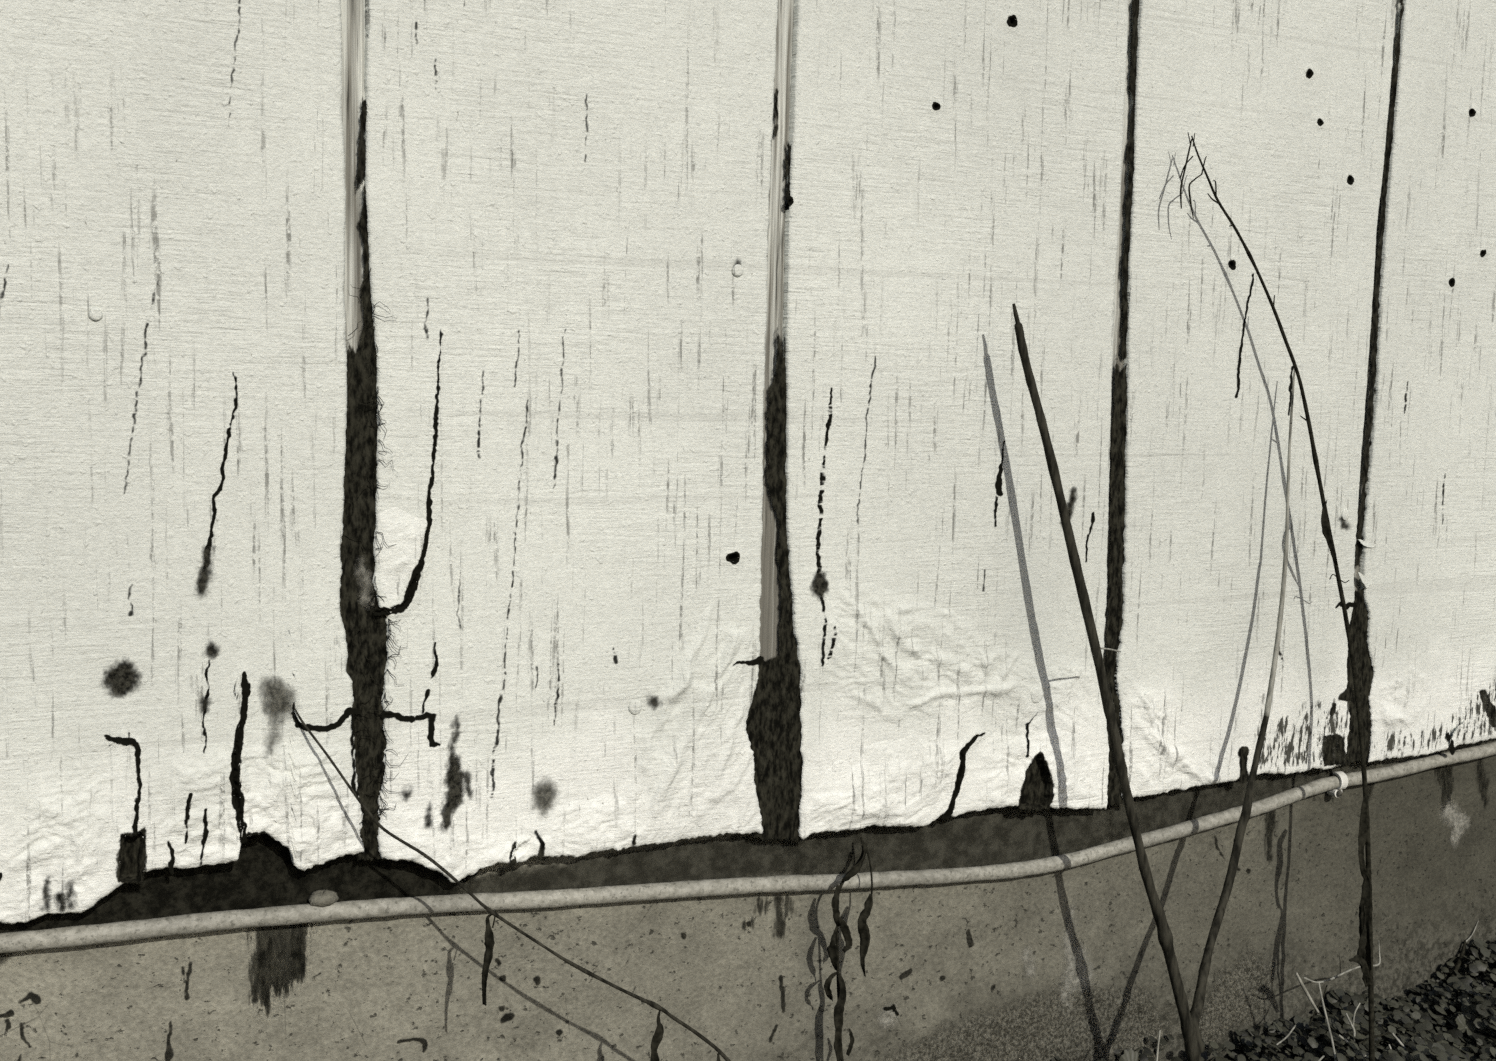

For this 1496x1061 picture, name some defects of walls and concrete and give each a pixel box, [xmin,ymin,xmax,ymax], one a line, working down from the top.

crack [197,372,238,594]
crack [373,298,443,616]
crack [477,330,566,795]
leakage [0,0,1139,938]
crack [104,642,265,874]
crack [291,587,461,796]
crack [942,732,985,820]
leakage [1133,588,1380,834]
leakage [1443,803,1467,843]
leakage [1480,690,1496,727]
leakage [257,933,305,1018]
leakage [1062,908,1092,1007]